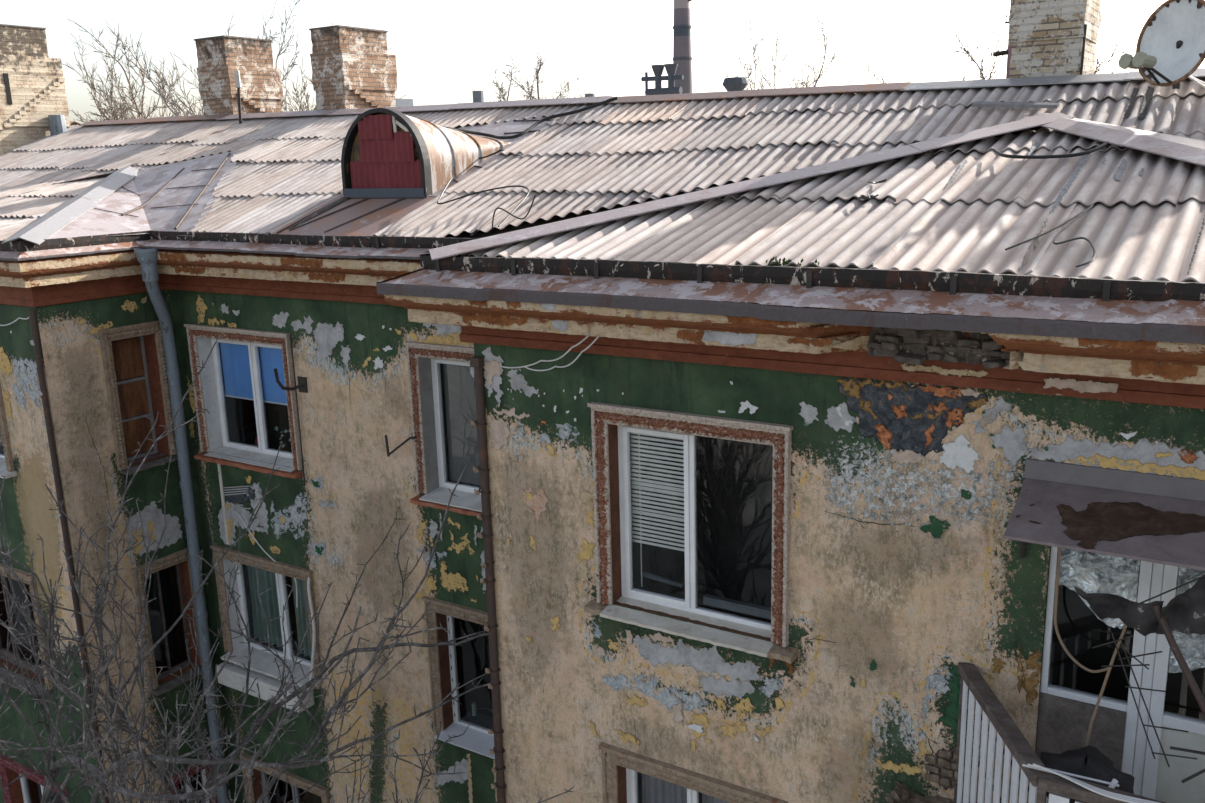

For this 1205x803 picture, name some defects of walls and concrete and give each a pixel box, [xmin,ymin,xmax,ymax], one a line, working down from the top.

rust [461,300,527,327]
rust [725,316,832,347]
peeling [0,347,41,419]
peeling [272,312,599,456]
flaking render [799,310,1205,539]
peeling [125,501,184,556]
peeling [218,475,337,558]
peeling [415,513,486,602]
peeling [1056,501,1205,549]
peeling [590,620,785,752]